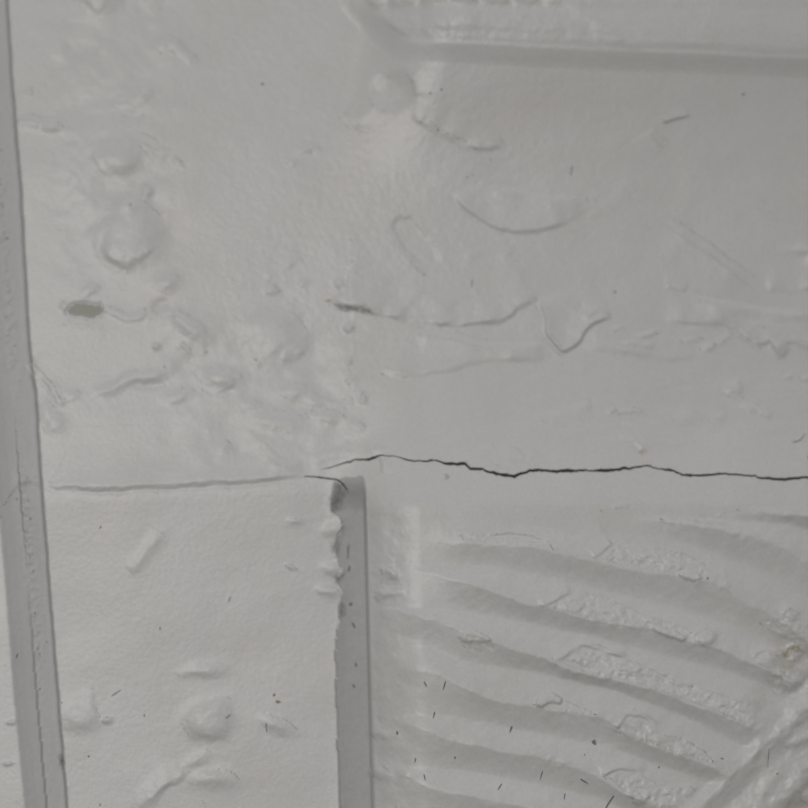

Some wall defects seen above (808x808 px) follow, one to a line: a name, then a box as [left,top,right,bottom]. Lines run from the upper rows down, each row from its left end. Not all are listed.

peeling [59,285,104,329]
peeling [330,298,611,381]
crack [45,454,808,496]